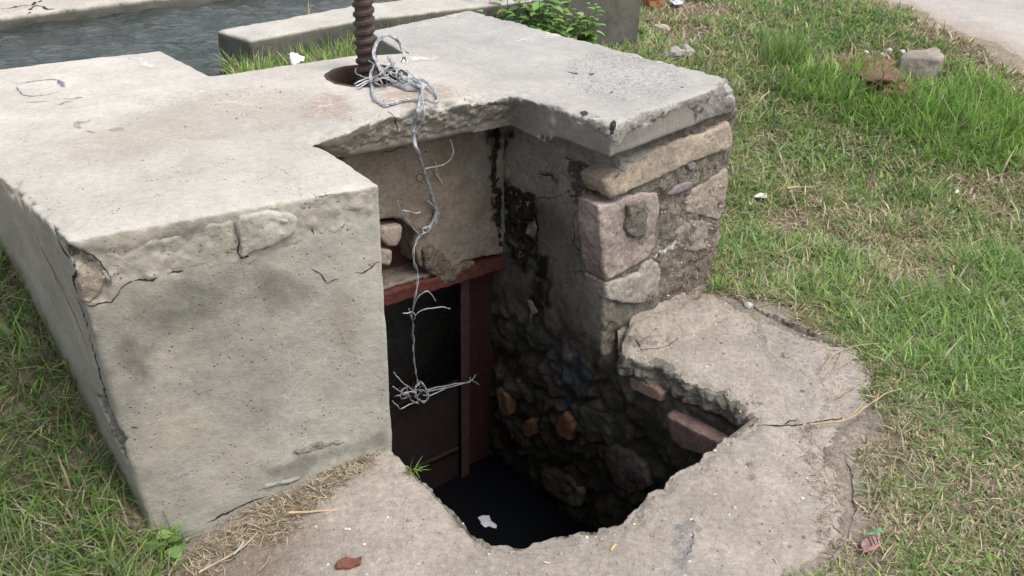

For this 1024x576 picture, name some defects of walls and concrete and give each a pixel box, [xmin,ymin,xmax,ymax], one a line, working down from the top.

spalling [341,100,523,151]
damp [486,127,551,319]
spalling [54,192,374,307]
crack [314,262,378,284]
crack [42,250,107,397]
crack [758,418,841,427]
crack [206,496,266,524]
spalling [612,493,661,536]
spalling [673,524,695,567]